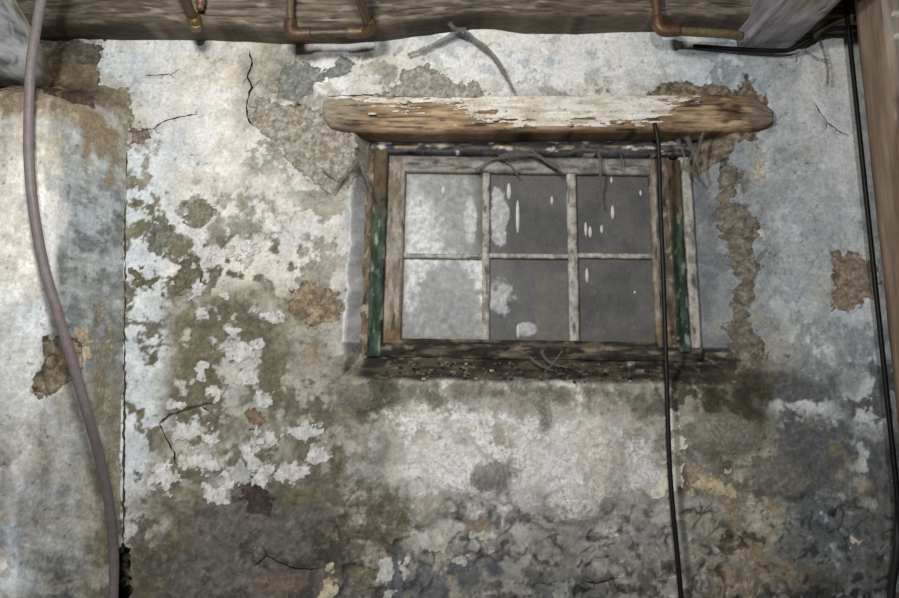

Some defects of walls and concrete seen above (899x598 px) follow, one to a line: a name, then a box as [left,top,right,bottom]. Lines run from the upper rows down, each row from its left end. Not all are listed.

crack [129,114,198,134]
crack [242,51,261,126]
spalling [248,54,362,195]
peeling [332,63,774,127]
spalling [170,252,213,321]
spalling [259,280,345,330]
spalling [690,126,771,375]
spalling [32,326,95,400]
crack [119,155,133,598]
crack [159,403,213,465]
peeling [146,326,333,518]
crack [255,545,318,570]